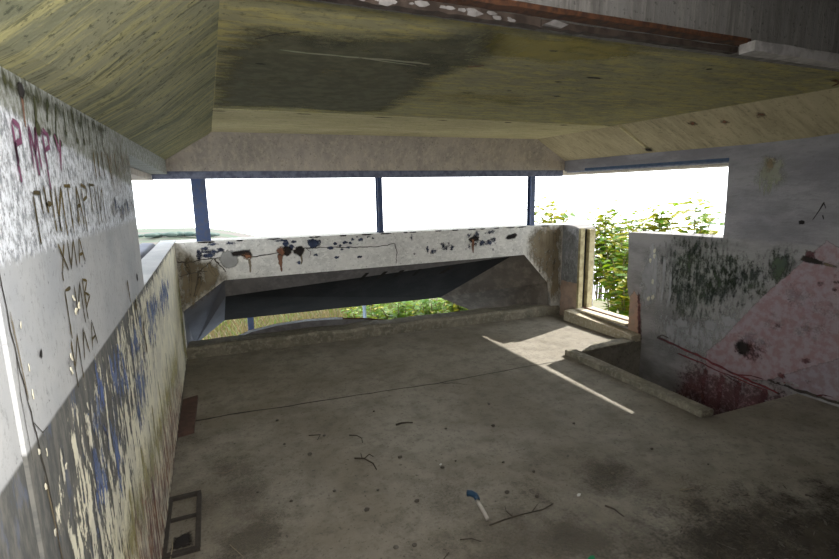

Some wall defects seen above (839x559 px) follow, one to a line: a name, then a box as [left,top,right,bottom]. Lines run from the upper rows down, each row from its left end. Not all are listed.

water stain [214,29,637,112]
peeling [55,243,187,559]
water stain [676,362,787,415]